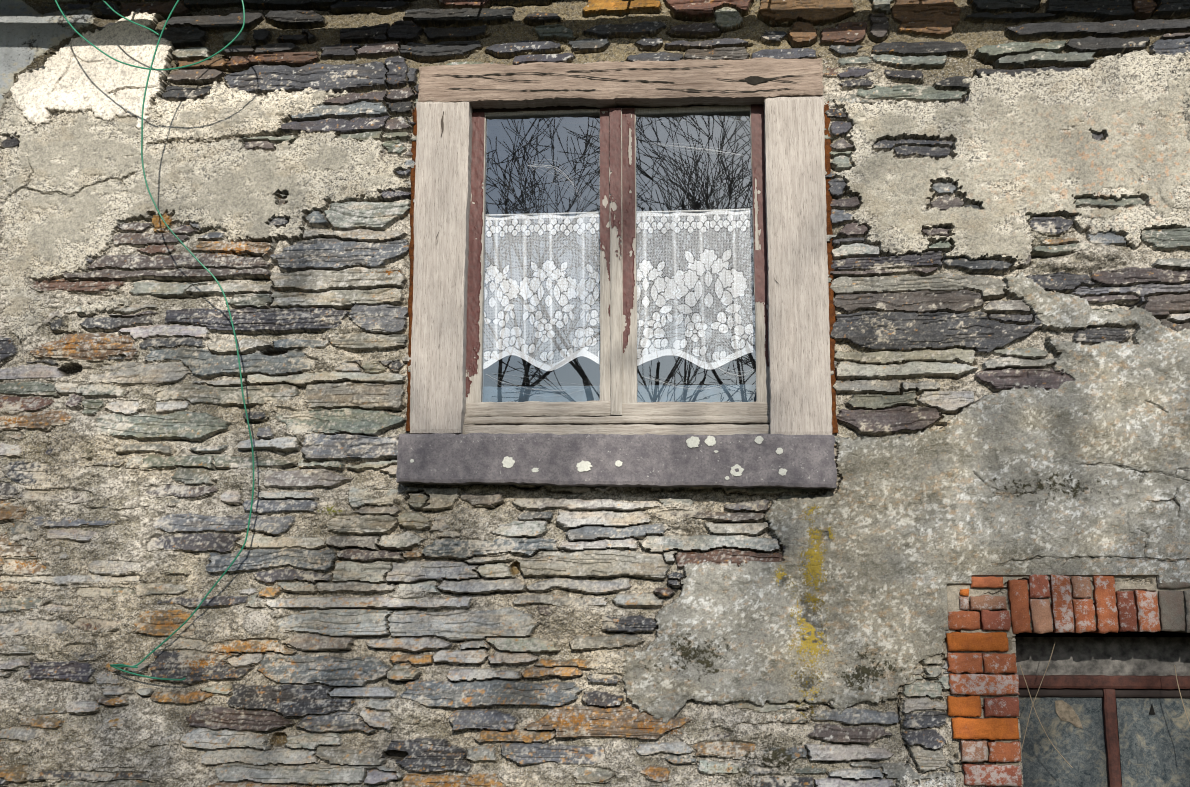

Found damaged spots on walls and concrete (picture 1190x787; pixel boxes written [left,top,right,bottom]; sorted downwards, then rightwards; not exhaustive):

peeling [0,11,411,504]
peeling [466,112,485,397]
peeling [600,108,635,353]
spalling [162,186,826,728]
peeling [622,49,1190,787]
crack [1002,463,1190,566]
peeling [269,732,288,748]
peeling [381,750,408,762]